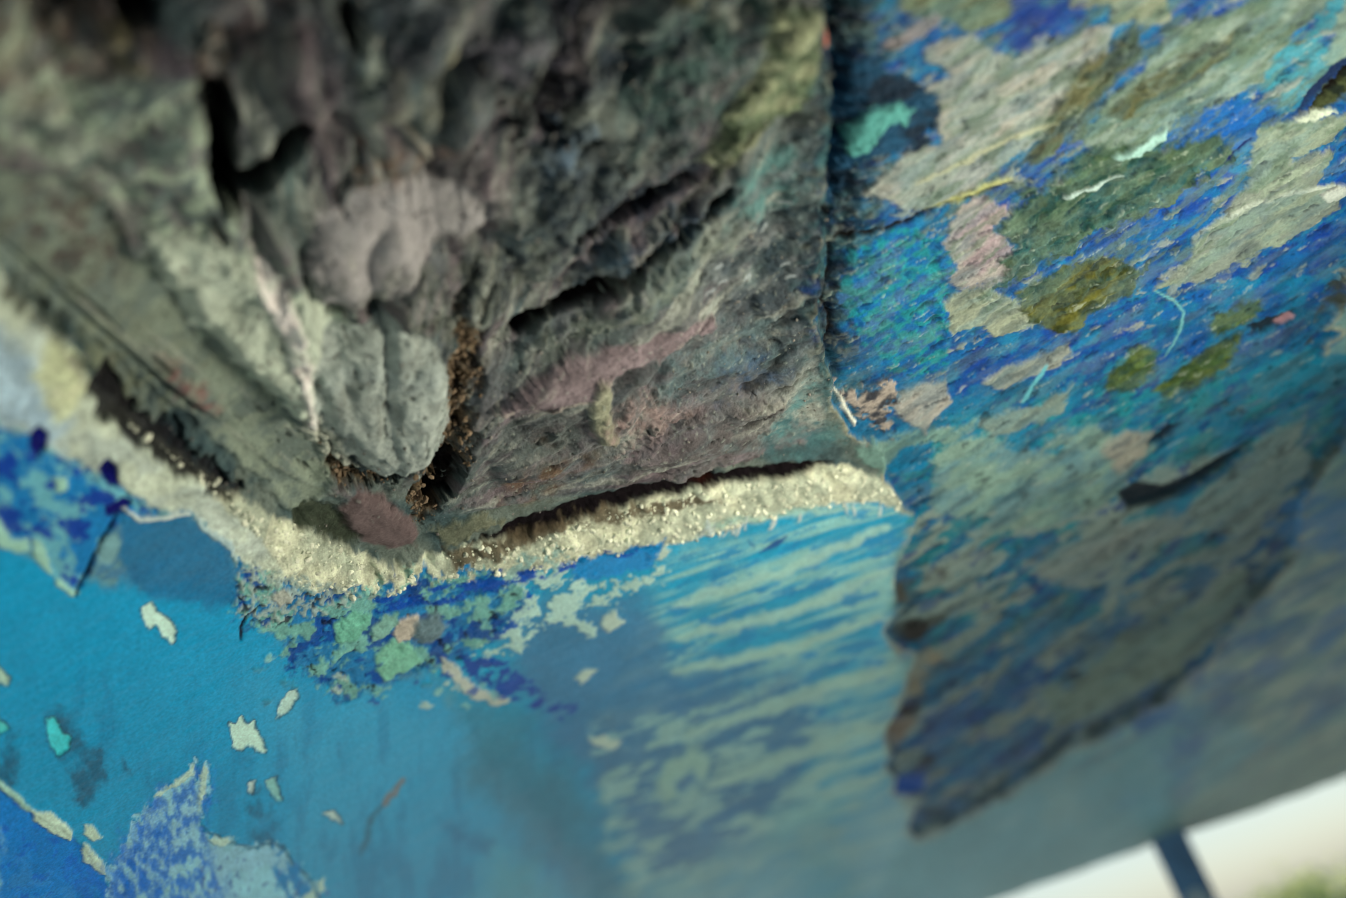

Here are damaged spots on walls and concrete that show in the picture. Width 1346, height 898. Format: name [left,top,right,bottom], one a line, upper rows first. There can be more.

peeling [1229,0,1346,162]
crack [1296,58,1346,123]
spalling [0,0,1257,707]
peeling [821,143,1346,840]
peeling [46,717,72,756]
peeling [230,716,268,754]
peeling [278,690,298,717]
peeling [590,736,623,749]